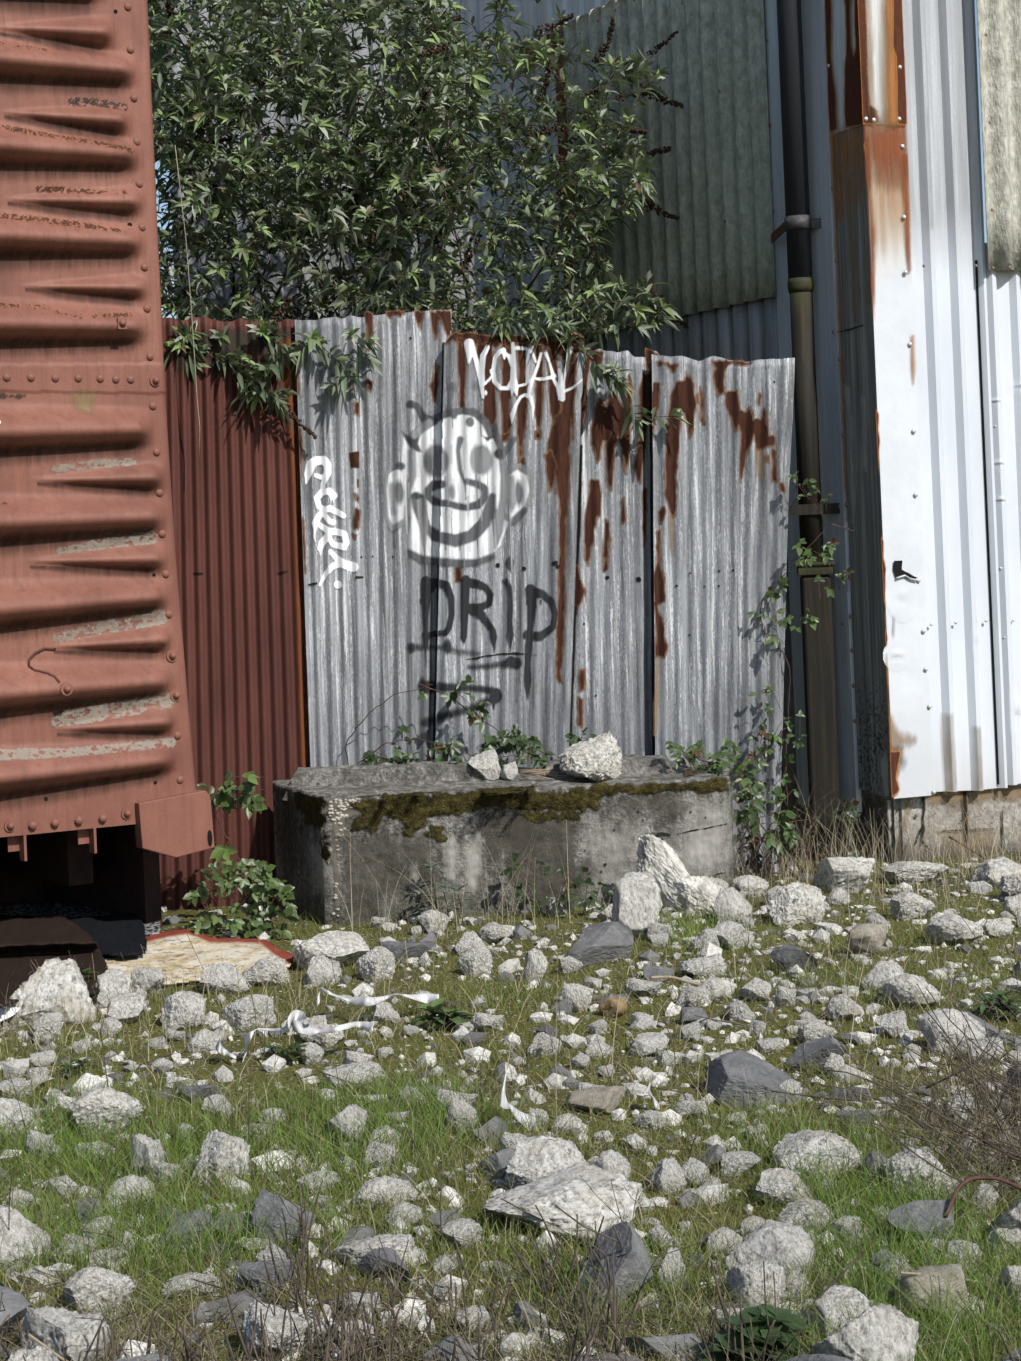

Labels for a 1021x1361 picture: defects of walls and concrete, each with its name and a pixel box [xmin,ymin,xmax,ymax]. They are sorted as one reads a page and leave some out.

rust [824,0,911,511]
rust [170,327,308,768]
rust [364,309,786,736]
rust [881,715,912,797]